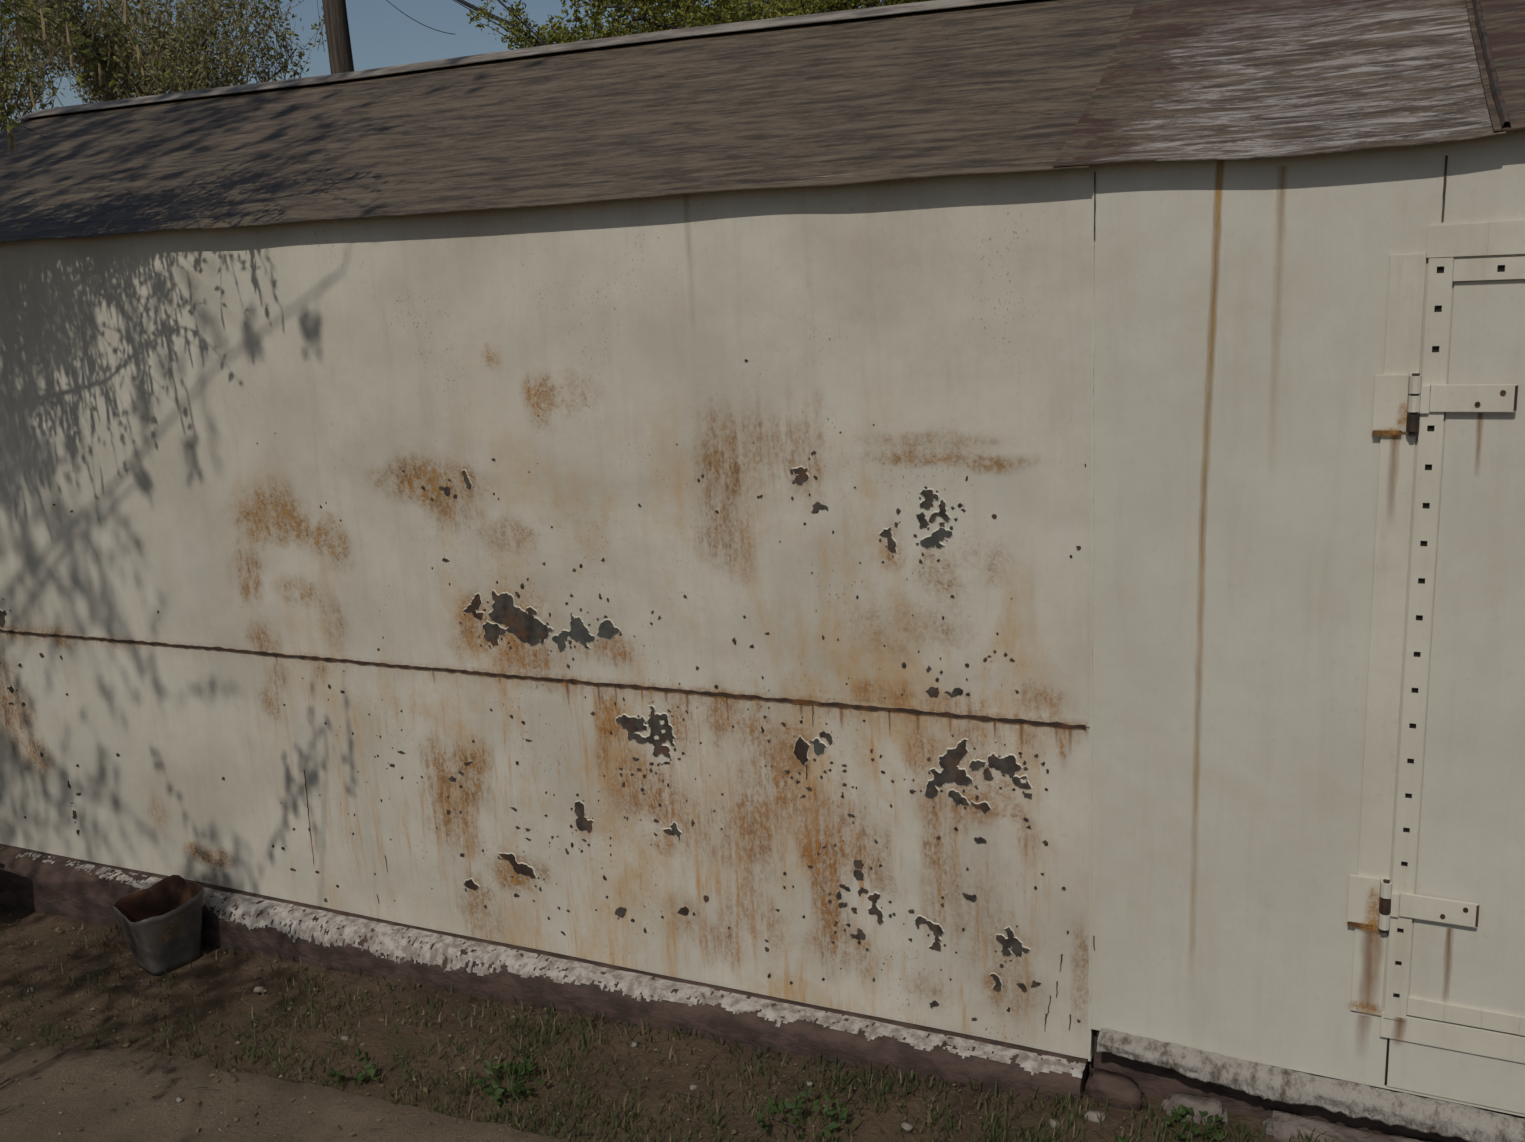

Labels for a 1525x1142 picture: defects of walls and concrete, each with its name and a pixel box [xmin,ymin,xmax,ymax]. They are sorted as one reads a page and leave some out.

corrosion [244,495,348,558]
corrosion [397,464,456,518]
peeling [878,486,966,564]
peeling [463,578,635,670]
corrosion [426,748,482,838]
peeling [610,701,685,792]
peeling [761,715,855,818]
peeling [910,734,1049,815]
corrosion [799,788,848,955]
peeling [828,860,965,954]
peeling [202,885,1086,1078]
corrosion [1356,894,1380,1013]